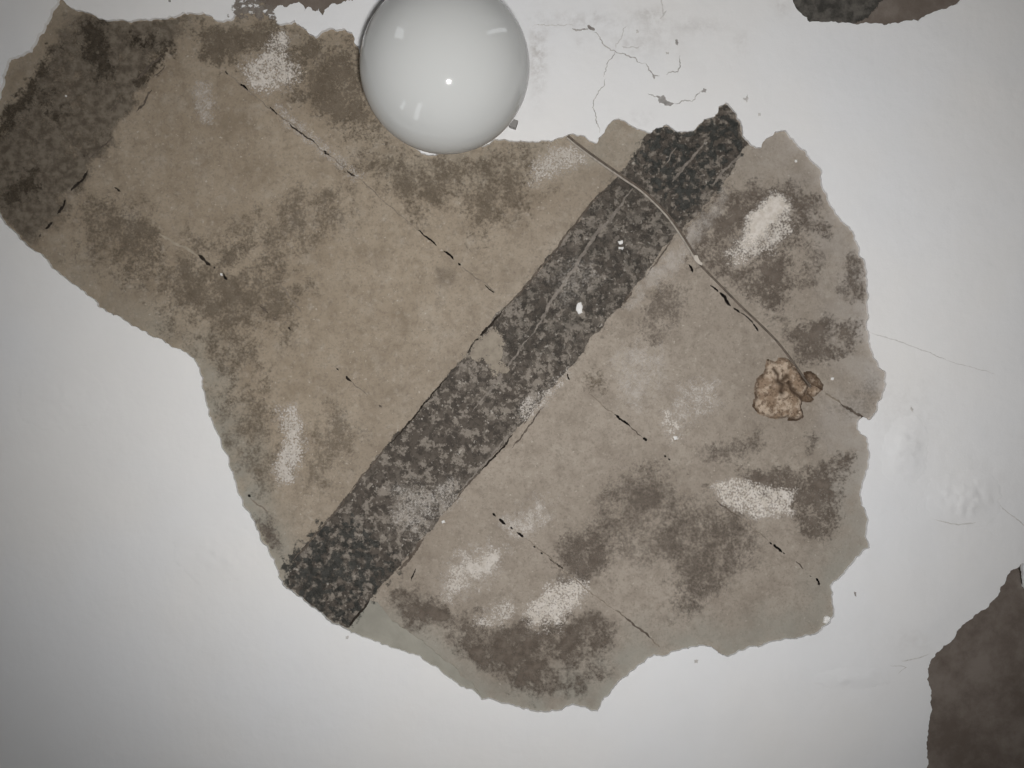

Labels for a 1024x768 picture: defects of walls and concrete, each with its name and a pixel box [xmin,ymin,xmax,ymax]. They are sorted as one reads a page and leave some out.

leakage [198,0,381,141]
crack [532,24,701,133]
peeling [793,0,960,25]
leakage [220,398,308,485]
peeling [0,0,677,629]
crack [225,71,495,293]
leakage [281,503,615,696]
crack [492,513,660,647]
peeling [349,105,885,711]
leakage [631,109,858,365]
leakage [657,453,855,609]
peeling [927,565,1024,768]